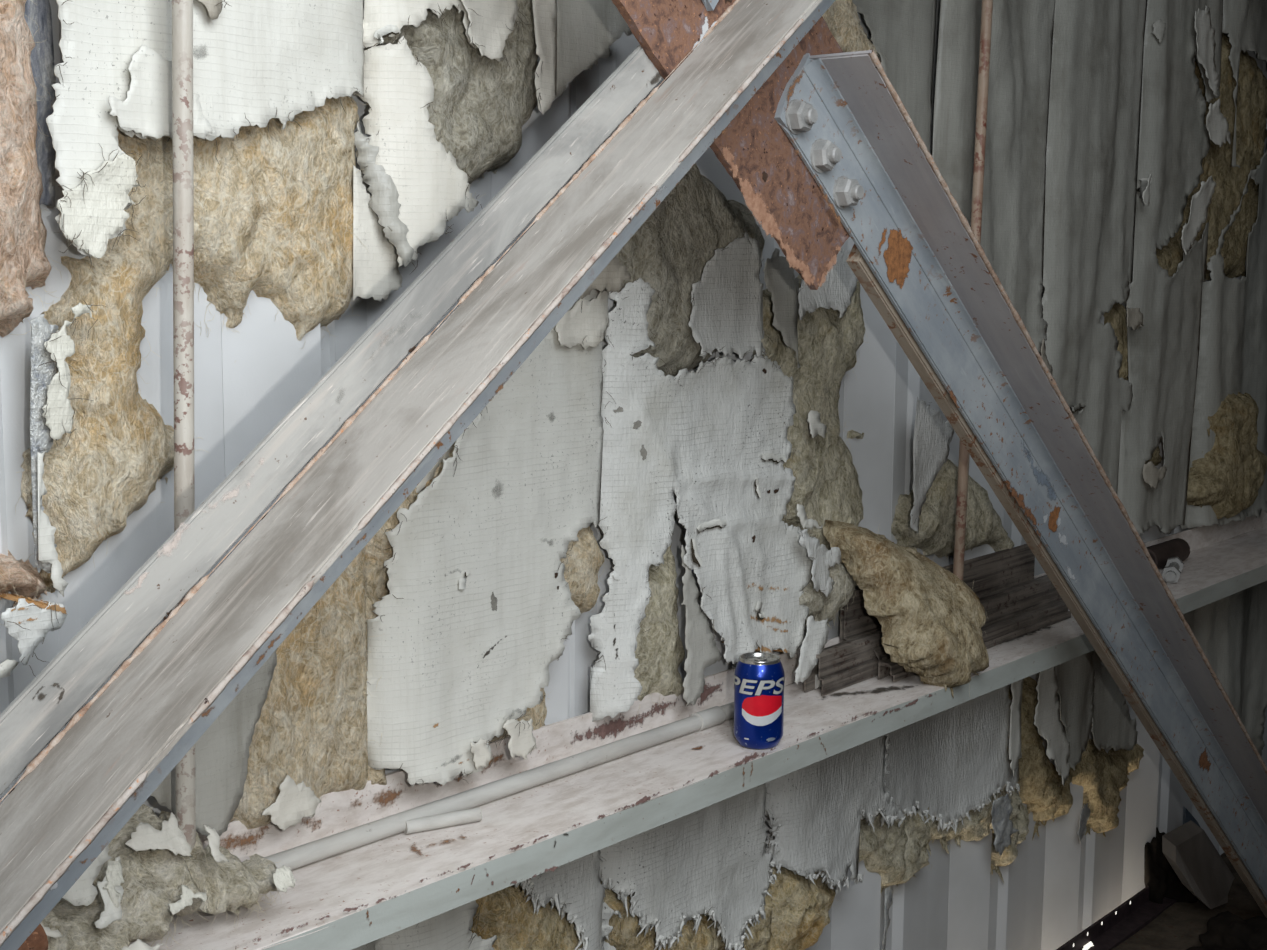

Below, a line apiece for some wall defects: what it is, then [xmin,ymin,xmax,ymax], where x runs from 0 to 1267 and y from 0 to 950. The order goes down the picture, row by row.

peeling [108,44,172,139]
peeling [193,93,217,139]
peeling [1195,5,1234,147]
peeling [1181,175,1217,255]
rust [869,49,1267,775]
rust [0,0,841,947]
rust [842,694,932,724]
peeling [1009,666,1070,786]